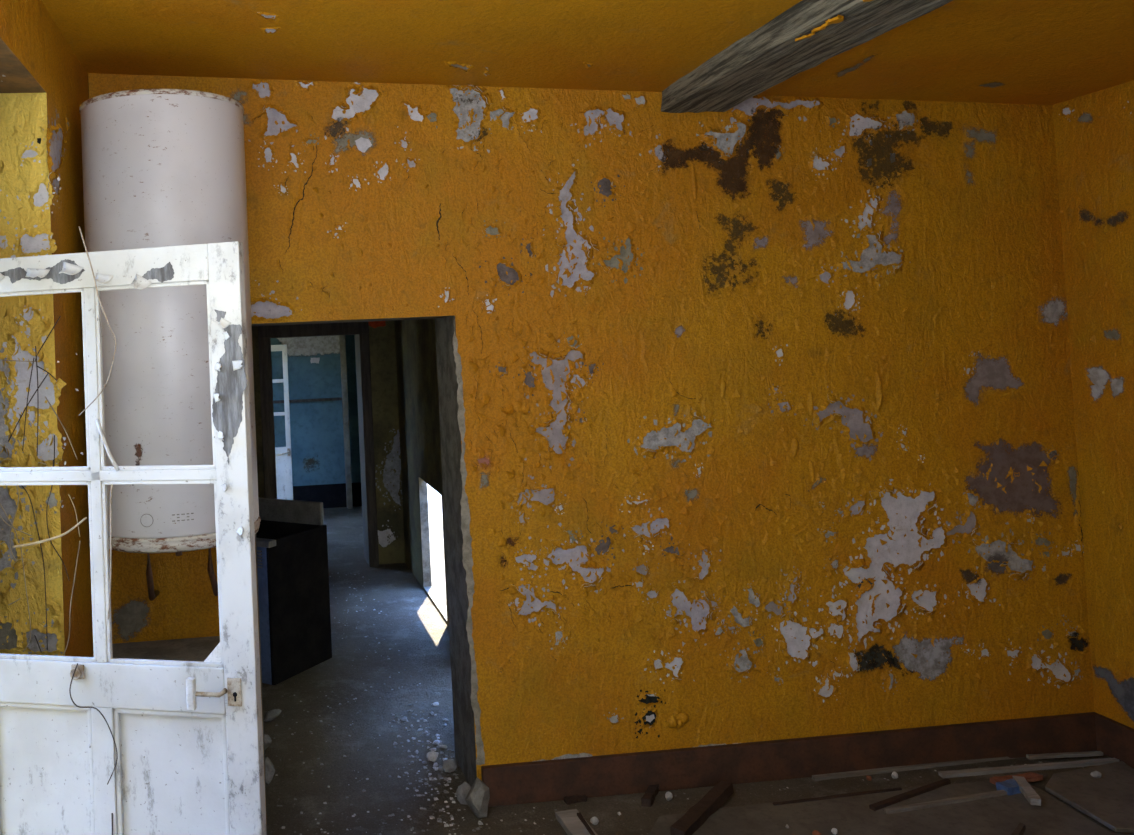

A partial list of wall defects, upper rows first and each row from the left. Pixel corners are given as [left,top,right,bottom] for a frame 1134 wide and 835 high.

peeling [0,113,85,284]
peeling [130,262,174,290]
crack [277,109,335,302]
peeling [479,93,648,314]
leakage [659,107,796,213]
leakage [703,213,768,293]
leakage [851,100,954,189]
peeling [0,296,79,467]
peeling [0,485,74,656]
peeling [489,332,1084,738]